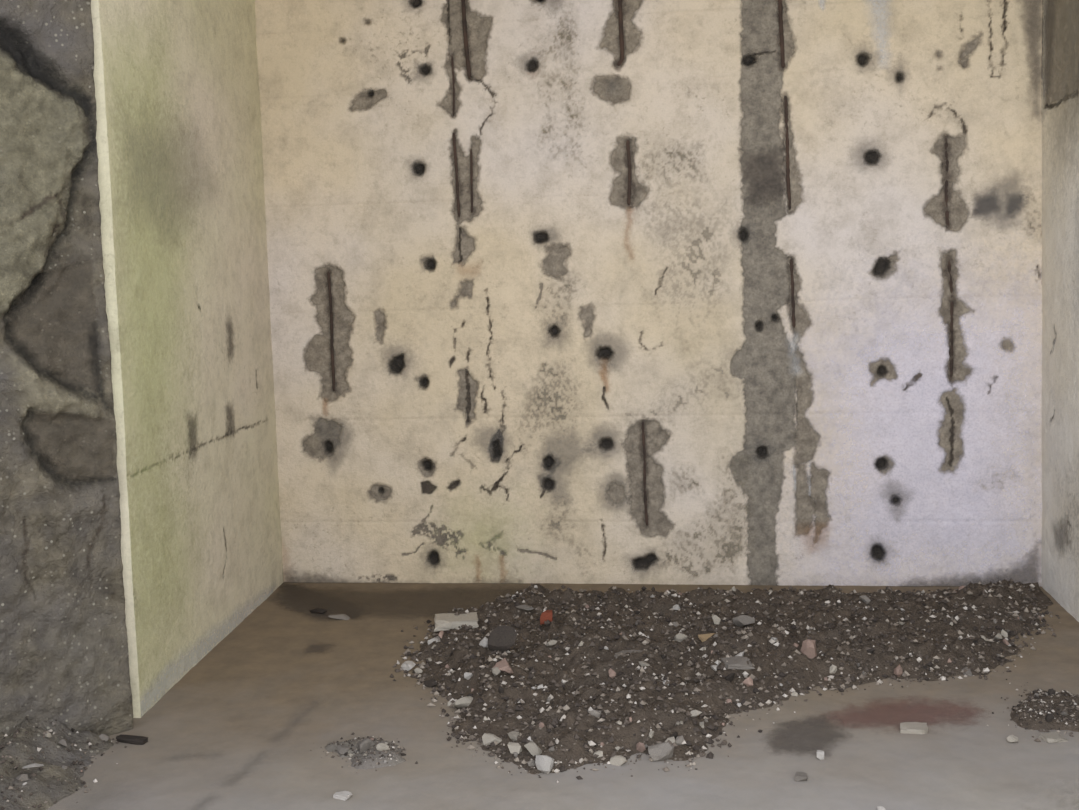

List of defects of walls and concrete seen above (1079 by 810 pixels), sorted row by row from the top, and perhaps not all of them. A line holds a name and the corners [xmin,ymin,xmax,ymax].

spalling [591,0,643,104]
spalling [778,0,795,68]
spalling [439,0,492,266]
spalling [609,136,649,209]
spalling [784,97,803,214]
spalling [924,134,969,231]
spalling [302,418,342,460]
spalling [303,264,355,402]
crack [481,297,522,501]
spalling [607,420,673,537]
spalling [788,258,830,543]
spalling [938,250,974,472]